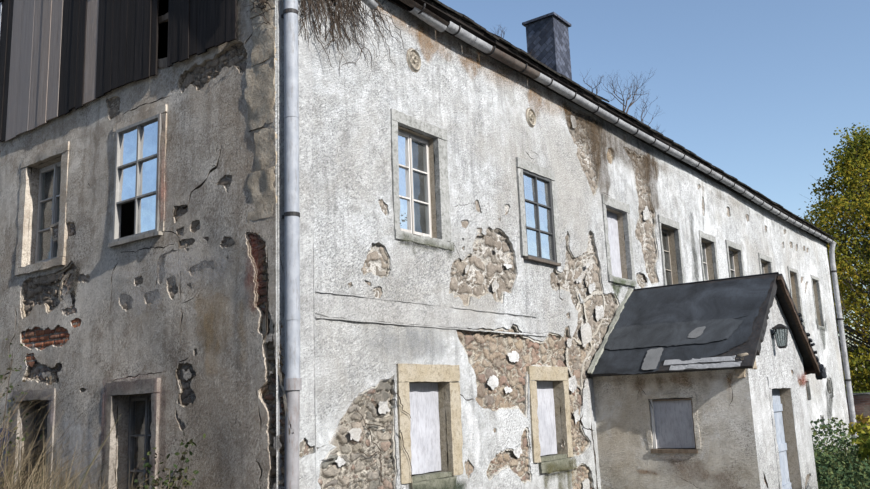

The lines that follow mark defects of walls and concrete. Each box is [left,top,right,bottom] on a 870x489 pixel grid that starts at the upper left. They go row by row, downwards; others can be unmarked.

flaking render [179,41,248,92]
flaking render [21,261,90,385]
flaking render [50,222,76,242]
crack [109,144,222,404]
flaking render [135,253,214,305]
flaking render [176,349,198,431]
flaking render [174,205,209,251]
flaking render [247,232,397,489]
flaking render [449,204,517,306]
flaking render [456,231,619,489]
flaking render [563,103,659,288]
leakage [565,110,658,207]